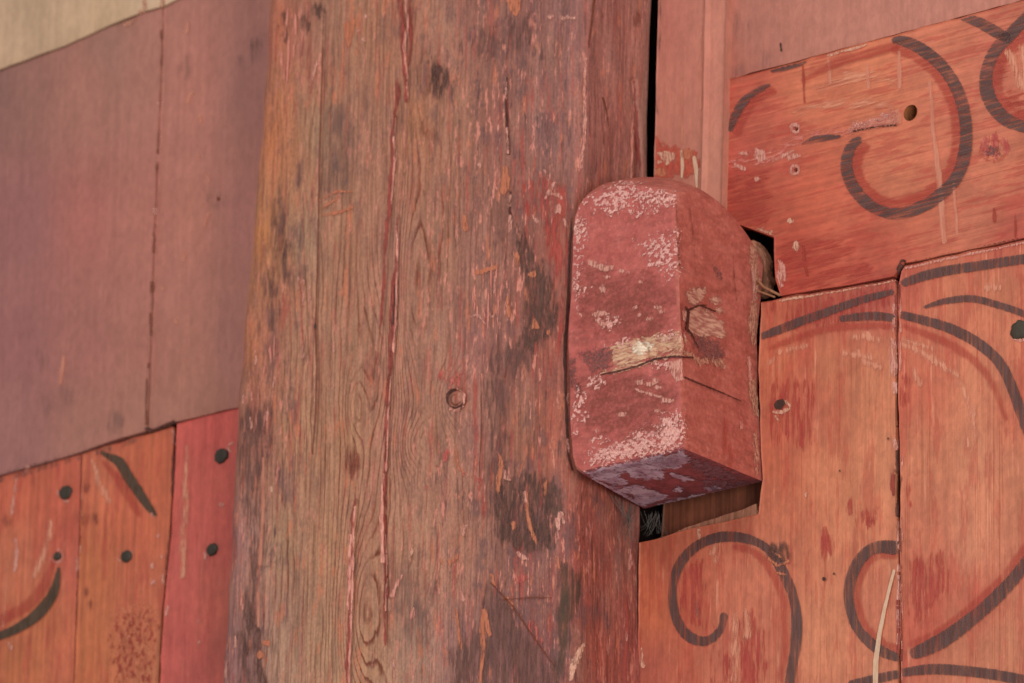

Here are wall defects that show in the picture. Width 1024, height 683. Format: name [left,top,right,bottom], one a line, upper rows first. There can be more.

peeling [543,136,745,507]